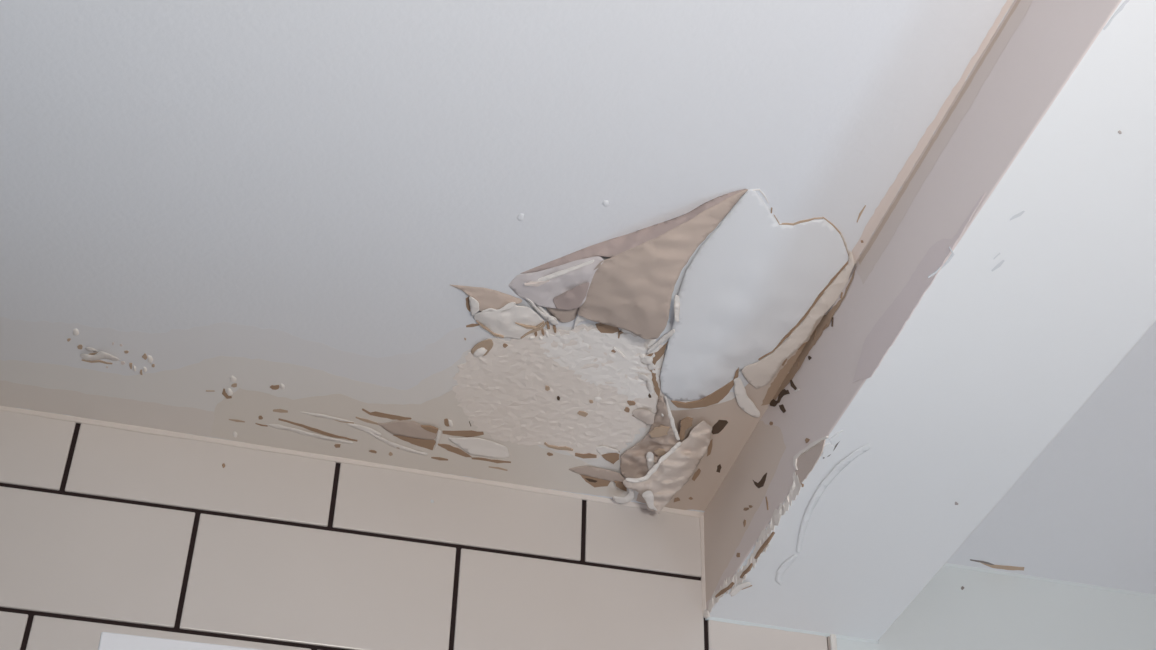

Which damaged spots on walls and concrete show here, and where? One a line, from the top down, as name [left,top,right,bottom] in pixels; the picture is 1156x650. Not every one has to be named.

flaking render [259,189,864,514]